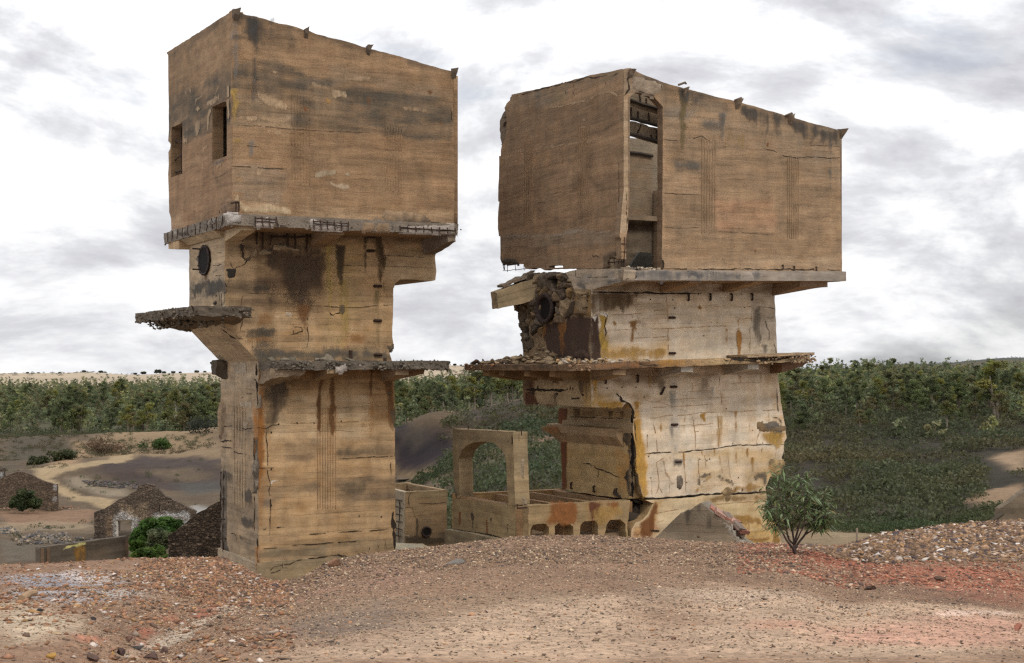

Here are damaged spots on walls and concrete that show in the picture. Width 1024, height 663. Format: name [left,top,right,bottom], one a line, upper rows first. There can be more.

leakage [248,17,273,44]
leakage [742,106,838,141]
spalling [135,301,254,330]
leakage [249,328,275,338]
leakage [267,243,345,304]
spalling [164,191,462,278]
spalling [501,229,609,352]
crack [525,255,833,540]
rust [253,407,264,485]
rust [525,392,577,525]
rust [635,401,657,537]